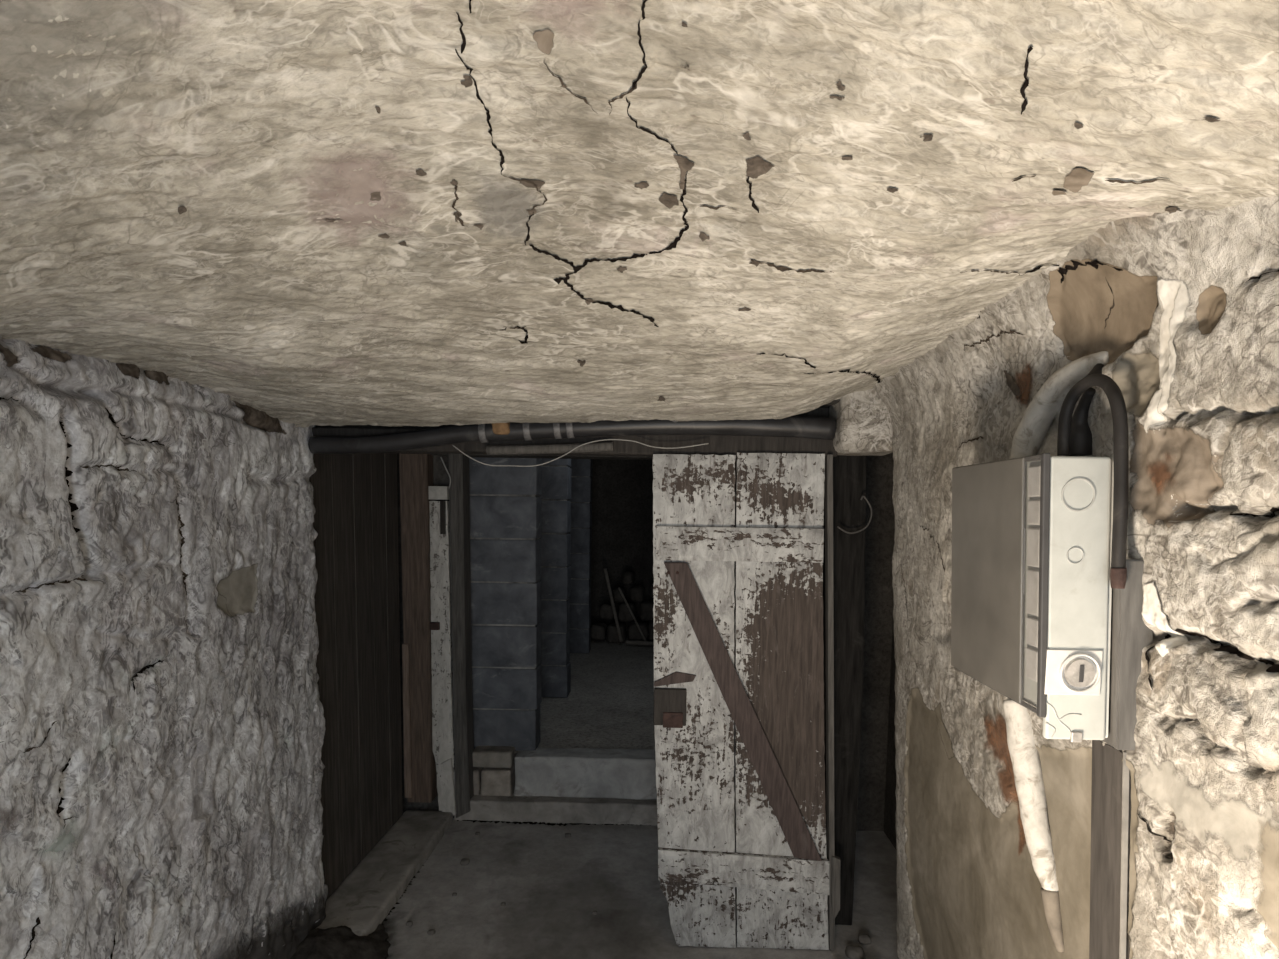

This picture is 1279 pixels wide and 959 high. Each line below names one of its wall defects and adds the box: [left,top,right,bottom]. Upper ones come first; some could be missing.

crack [1020,46,1033,115]
crack [452,0,735,327]
crack [747,259,834,273]
crack [757,353,880,383]
flaking render [1047,259,1227,528]
crack [1230,508,1279,518]
flaking render [216,563,258,618]
crack [1145,629,1279,690]
crack [0,720,58,753]
crack [56,758,78,829]